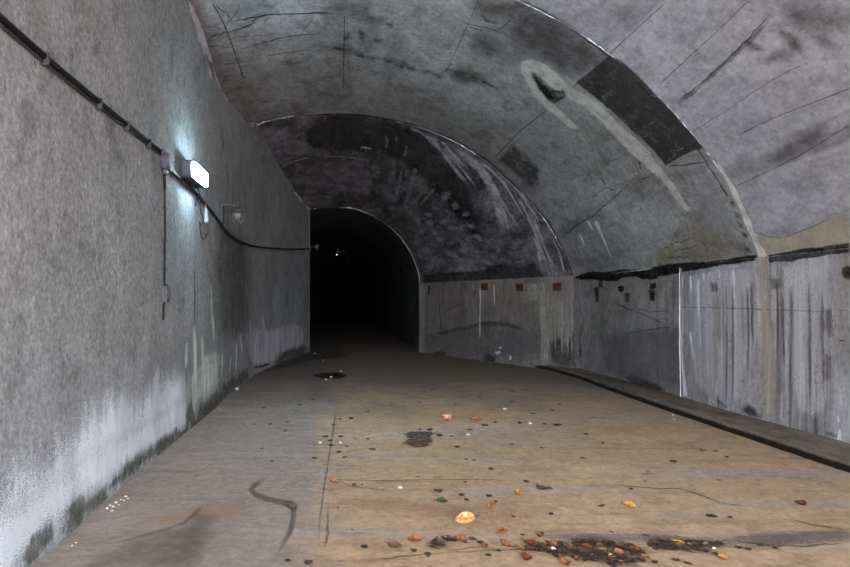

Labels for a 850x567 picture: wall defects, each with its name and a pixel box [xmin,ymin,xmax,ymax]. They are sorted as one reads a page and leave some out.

crack [209,4,326,56]
spalling [532,73,565,103]
leakage [411,128,565,271]
leakage [480,4,850,418]
leakage [0,238,344,567]